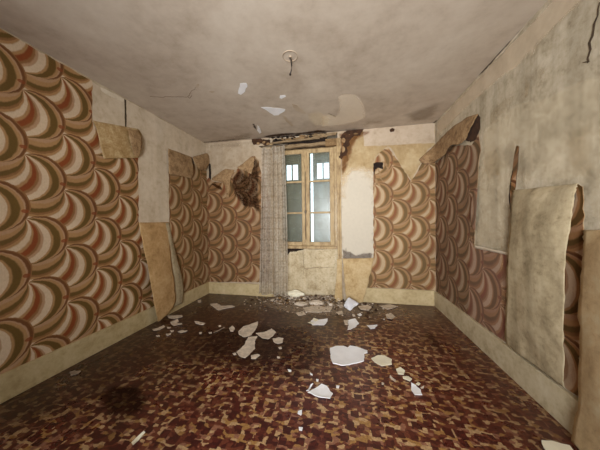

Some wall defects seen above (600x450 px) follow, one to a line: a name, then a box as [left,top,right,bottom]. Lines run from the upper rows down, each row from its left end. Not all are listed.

crack [582,2,600,63]
flaking render [92,82,272,336]
leakage [341,132,367,171]
peeling [335,123,435,330]